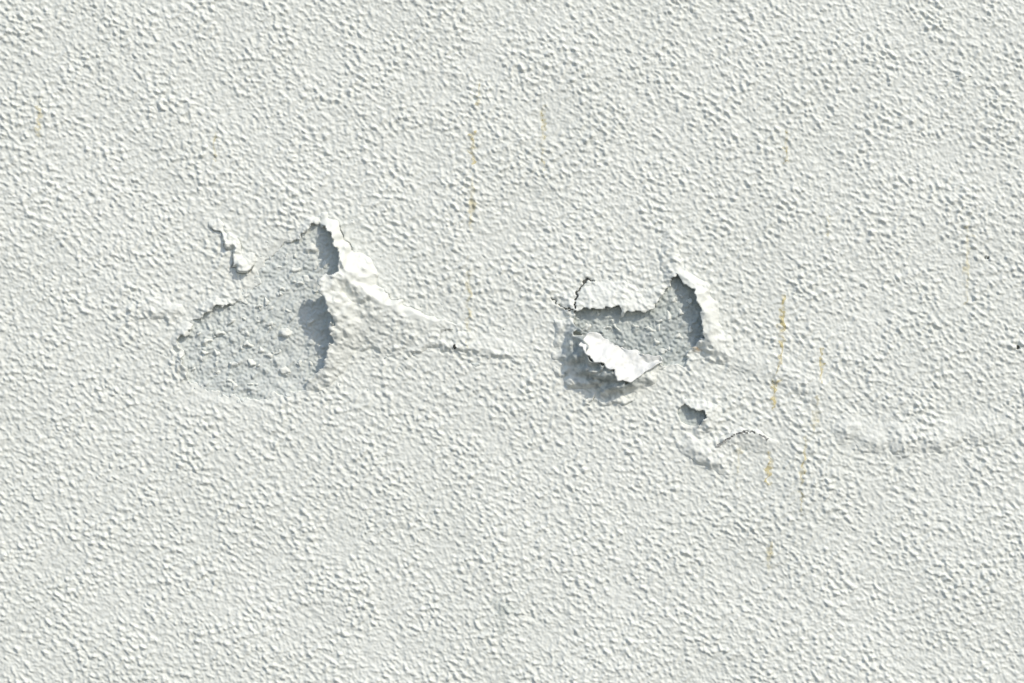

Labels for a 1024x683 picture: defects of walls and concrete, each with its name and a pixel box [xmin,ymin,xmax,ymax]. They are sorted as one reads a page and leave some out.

peeling [163,209,468,402]
crack [551,278,593,312]
peeling [551,213,744,406]
peeling [678,397,733,440]
crack [716,430,769,447]